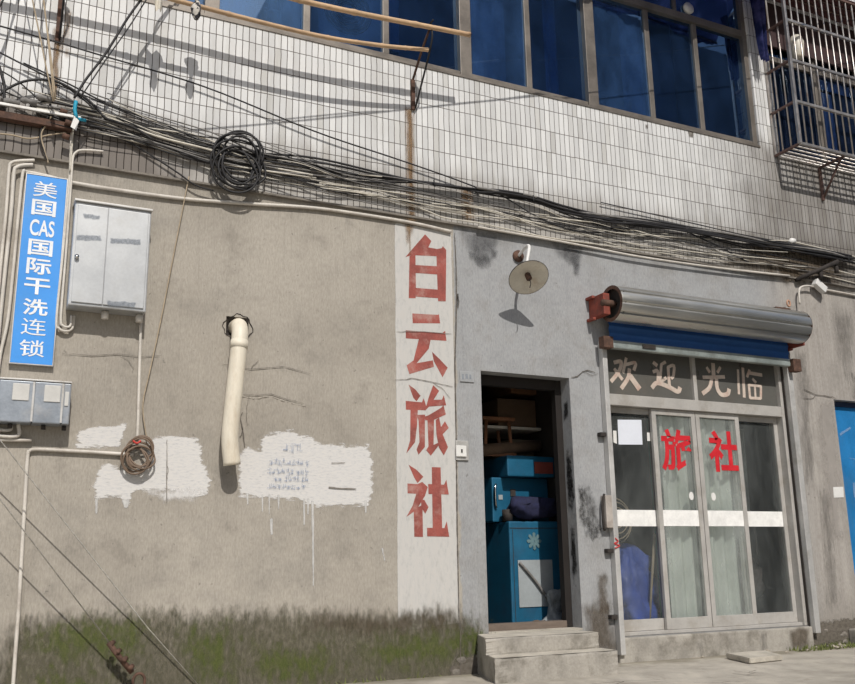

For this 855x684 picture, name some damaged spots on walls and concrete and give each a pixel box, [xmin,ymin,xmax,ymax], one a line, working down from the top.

corrosion [406,109,414,238]